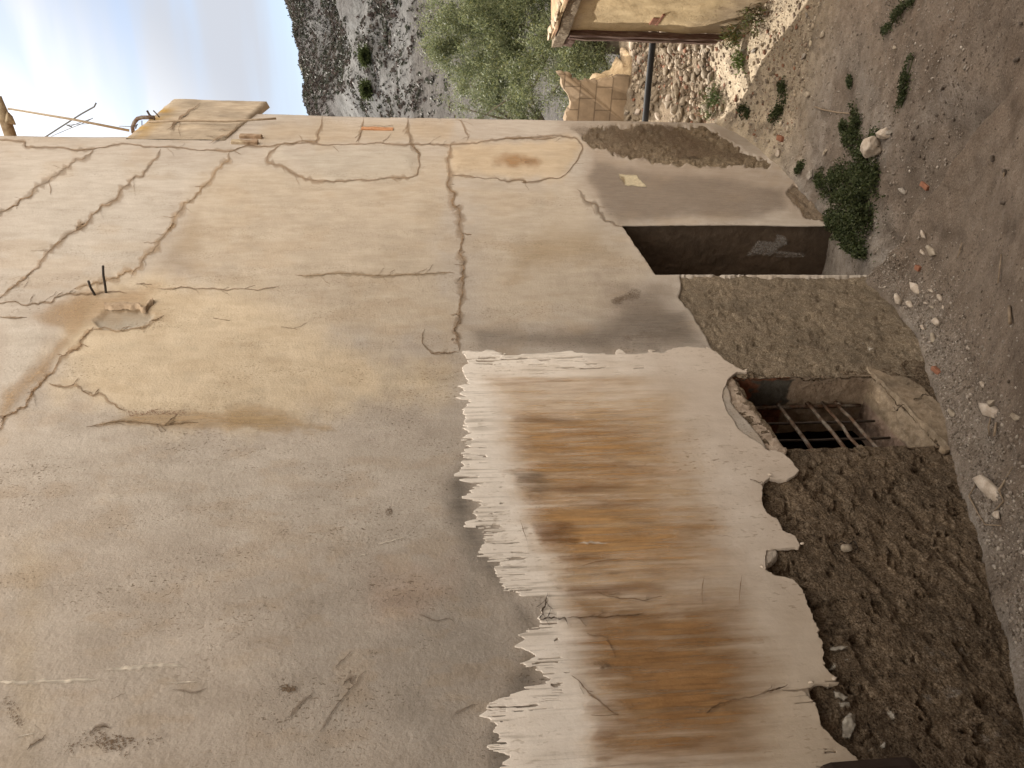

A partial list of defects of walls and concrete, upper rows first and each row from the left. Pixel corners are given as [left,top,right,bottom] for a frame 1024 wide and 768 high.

flaking render [570,123,771,169]
crack [0,105,617,355]
flaking render [104,297,153,314]
crack [0,316,198,433]
peeling [451,275,1024,768]